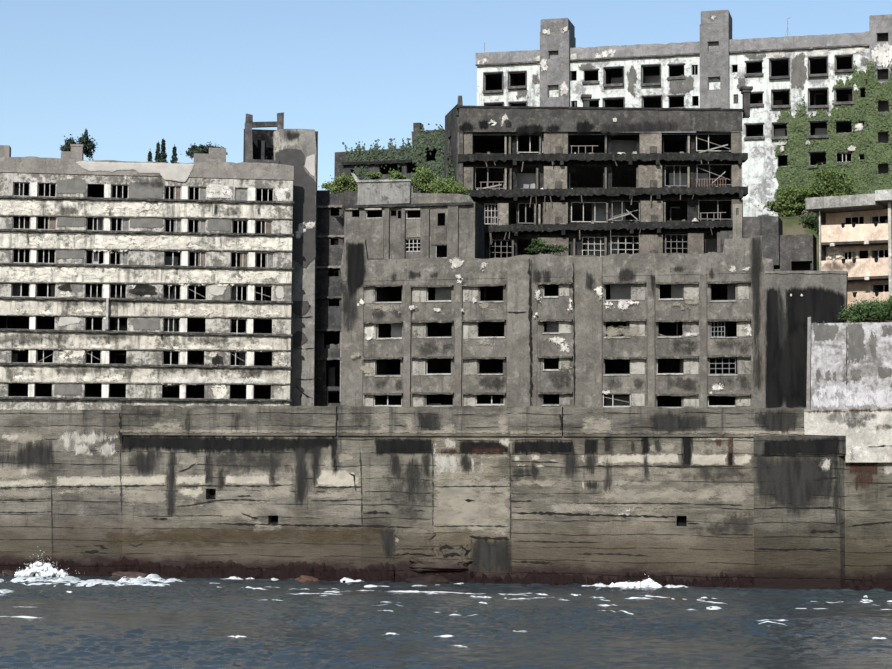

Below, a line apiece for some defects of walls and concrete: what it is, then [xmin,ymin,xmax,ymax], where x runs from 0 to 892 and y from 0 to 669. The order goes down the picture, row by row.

peeling [515,55,548,100]
peeling [571,49,616,70]
peeling [626,65,637,98]
peeling [669,75,694,94]
peeling [144,267,311,317]
leakage [341,242,365,329]
spalling [594,286,639,312]
spalling [549,336,572,373]
peeling [812,321,892,387]
leakage [741,237,892,524]
leakage [0,414,337,515]
crack [0,413,892,564]